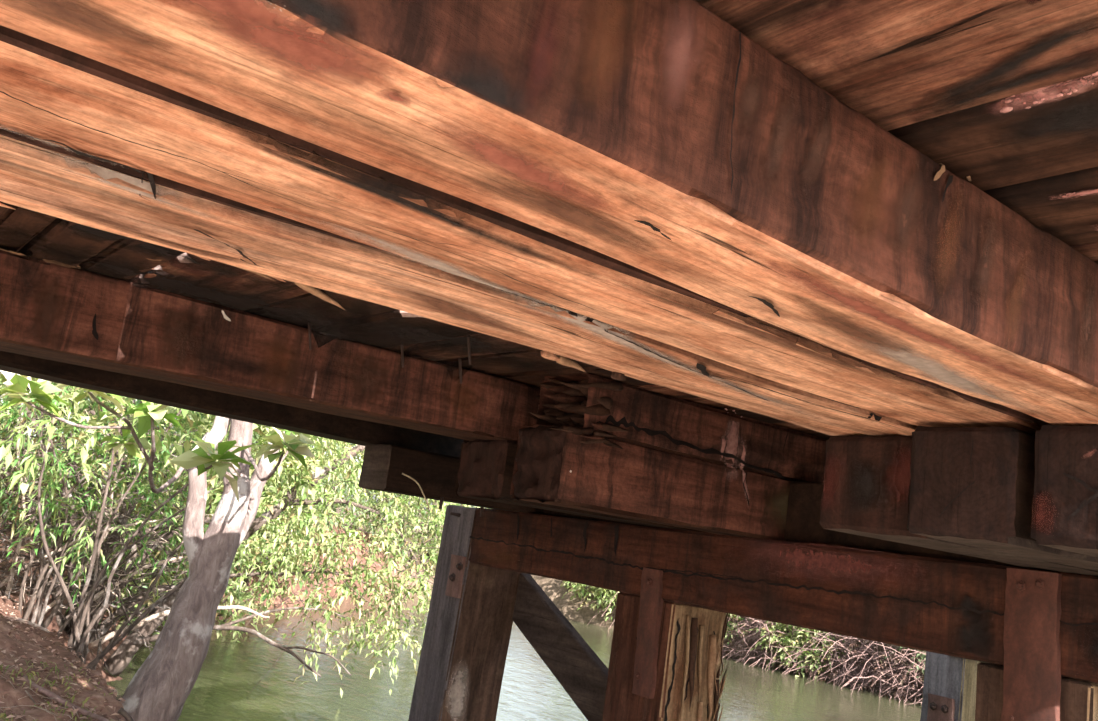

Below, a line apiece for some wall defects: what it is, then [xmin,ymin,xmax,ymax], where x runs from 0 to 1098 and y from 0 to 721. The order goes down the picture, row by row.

crack [730,31,741,195]
leakage [937,24,1098,141]
crack [0,91,882,421]
crack [597,415,795,505]
crack [469,514,1004,616]
crack [664,620,715,721]